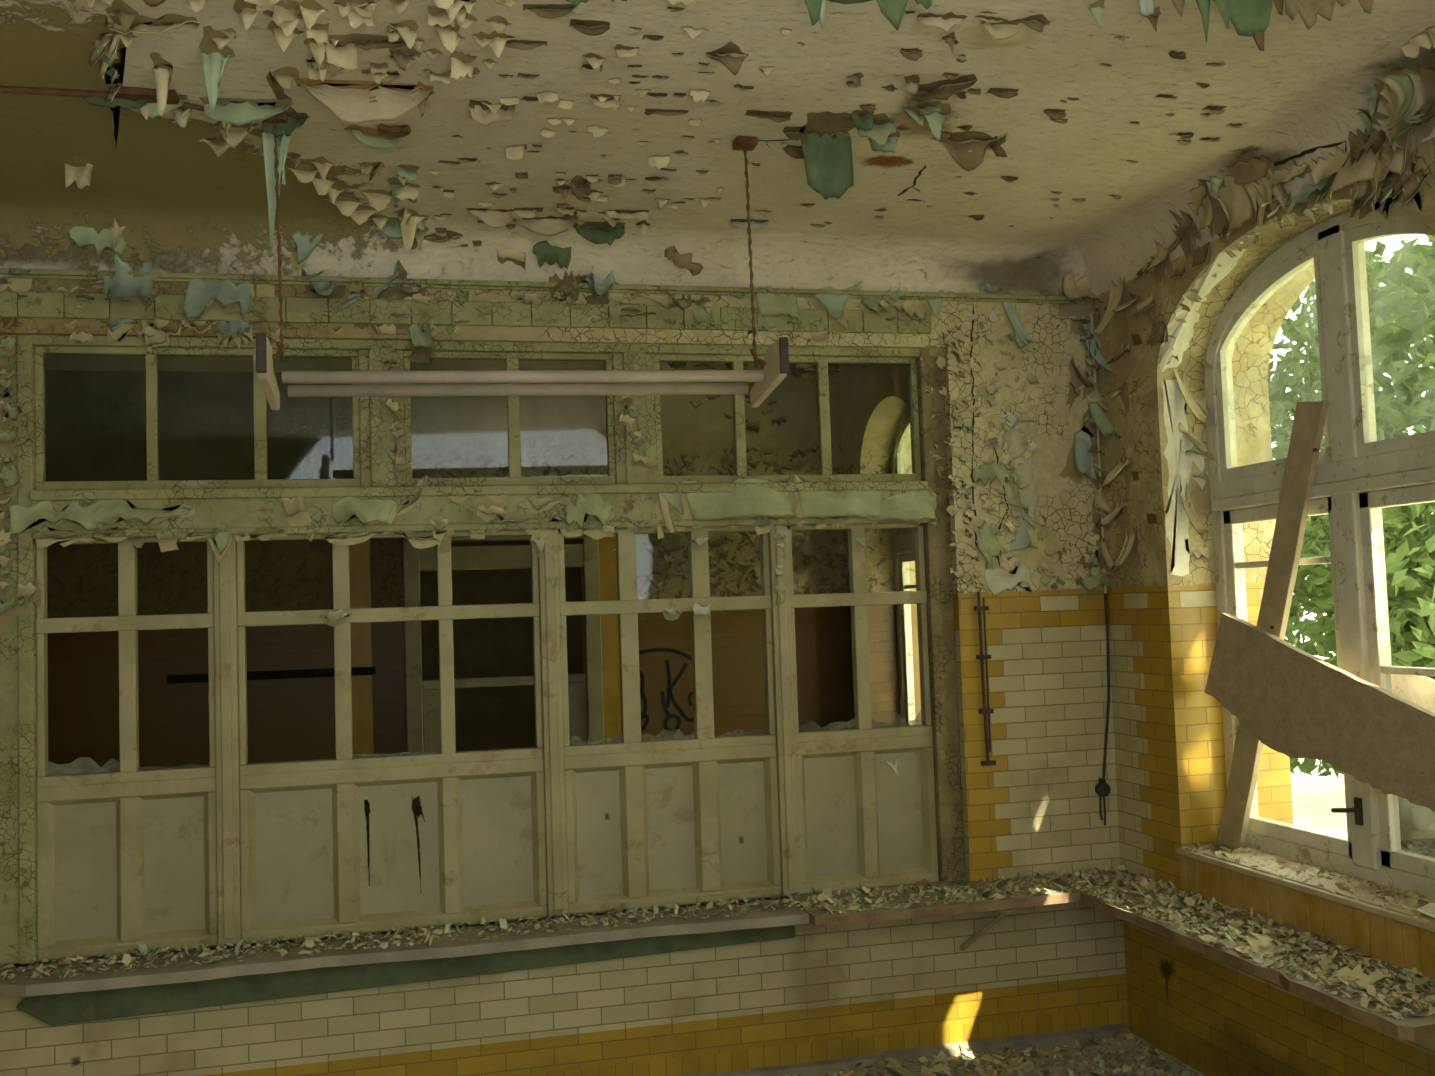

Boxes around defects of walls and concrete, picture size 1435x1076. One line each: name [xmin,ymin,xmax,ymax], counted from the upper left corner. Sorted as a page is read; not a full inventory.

peeling [0,0,1435,621]
crack [970,304,1034,566]